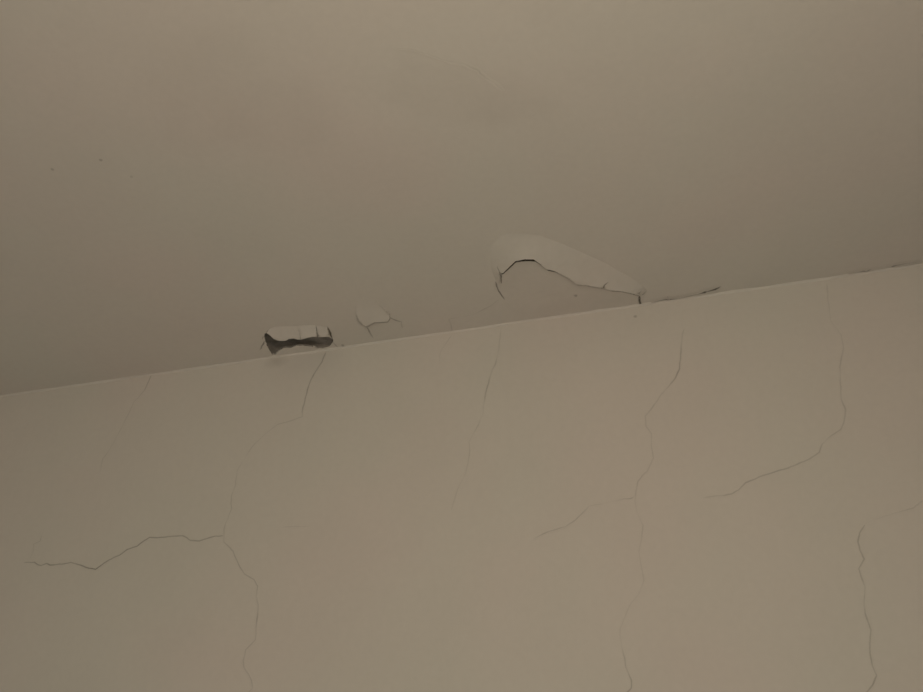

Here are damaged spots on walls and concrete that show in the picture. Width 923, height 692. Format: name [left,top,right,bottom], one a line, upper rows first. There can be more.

spalling [259,325,338,354]